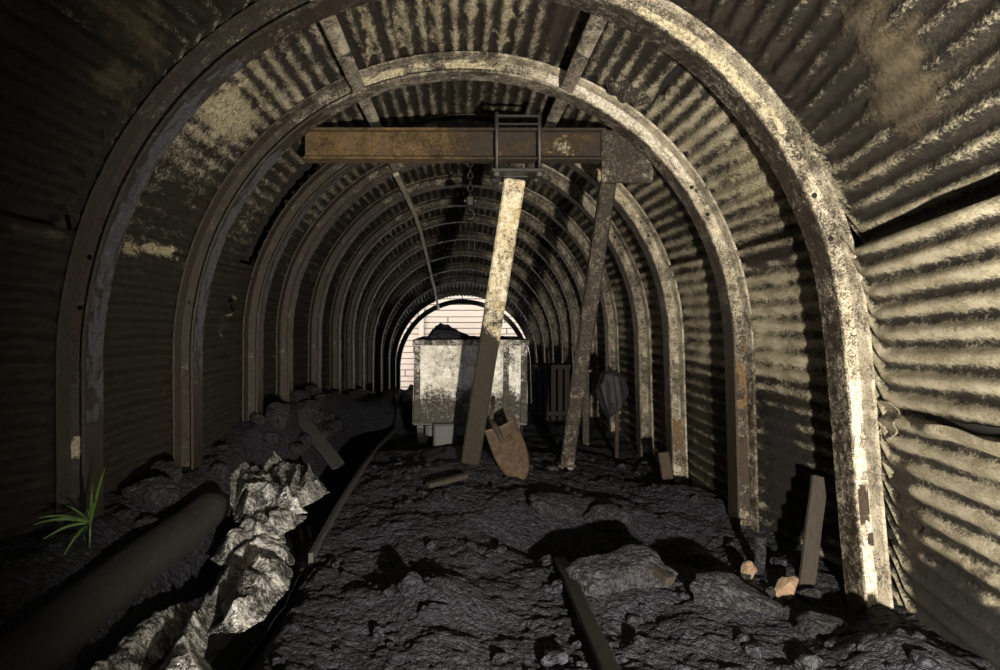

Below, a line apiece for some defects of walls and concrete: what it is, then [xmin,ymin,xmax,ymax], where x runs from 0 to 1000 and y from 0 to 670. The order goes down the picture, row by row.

rust [737,340,748,423]